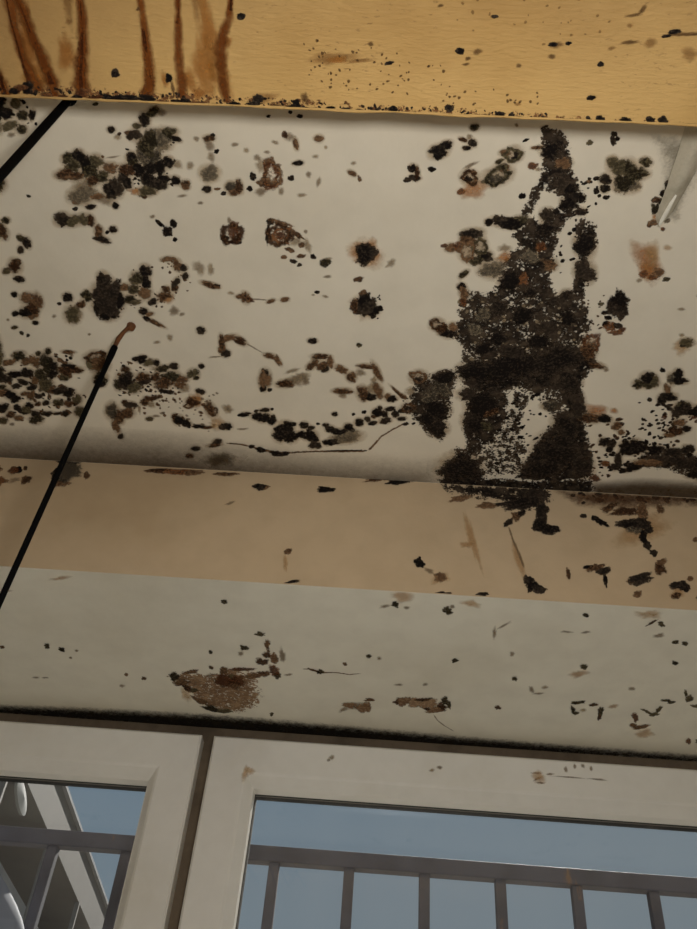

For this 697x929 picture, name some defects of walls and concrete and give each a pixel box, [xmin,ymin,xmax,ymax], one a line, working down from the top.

rust [0,0,351,109]
damp [303,39,359,91]
damp [662,29,697,38]
damp [0,79,697,599]
peeling [167,631,291,713]
peeling [341,698,375,713]
peeling [392,696,451,730]